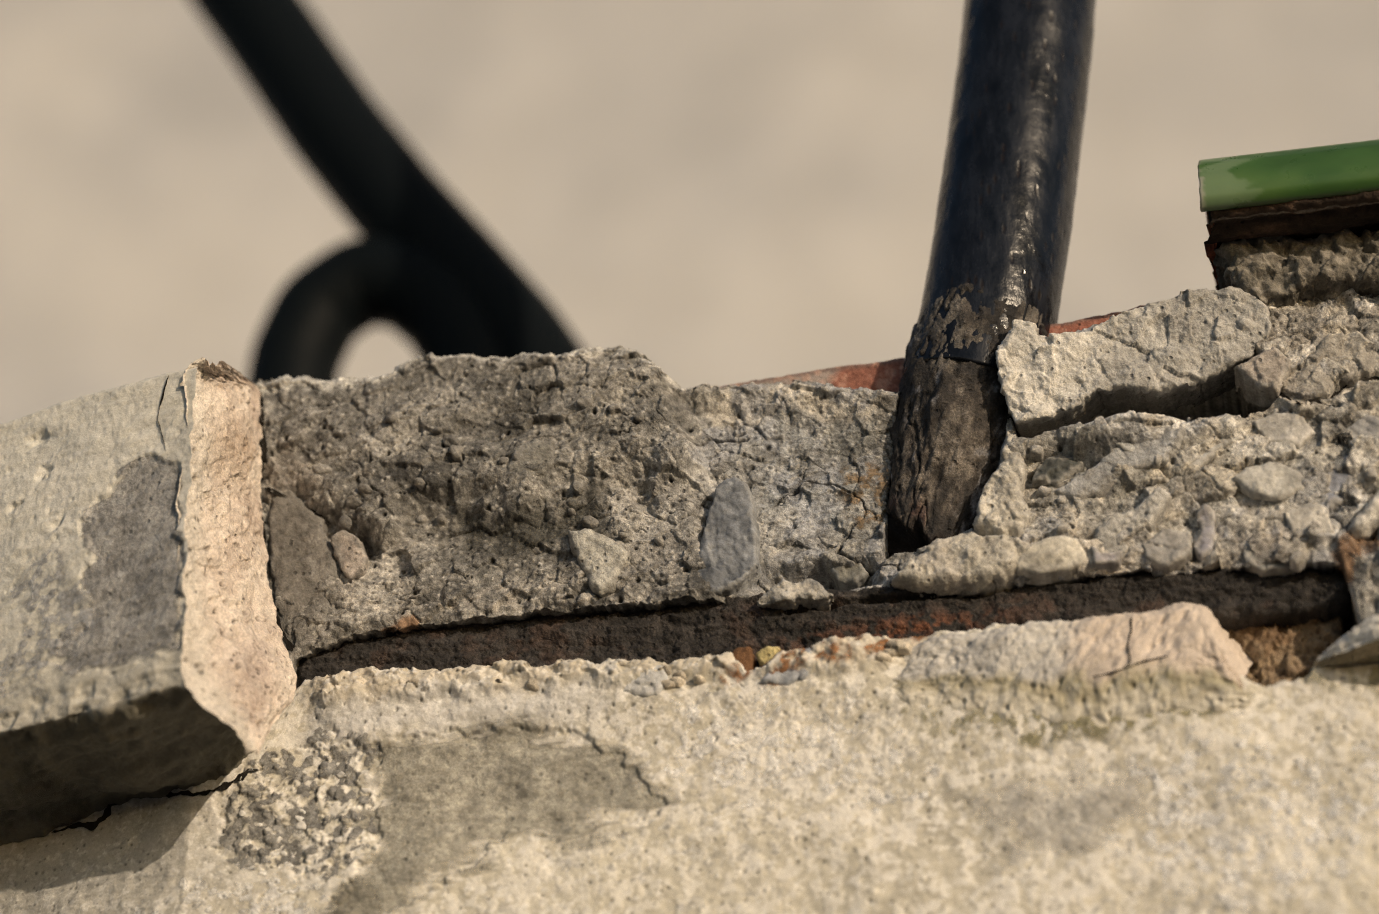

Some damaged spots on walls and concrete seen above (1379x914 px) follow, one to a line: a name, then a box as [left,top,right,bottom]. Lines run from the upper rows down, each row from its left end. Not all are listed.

crack [1276,376,1379,407]
spalling [254,286,1379,675]
rust [296,535,1379,689]
crack [166,768,261,798]
crack [51,804,118,833]